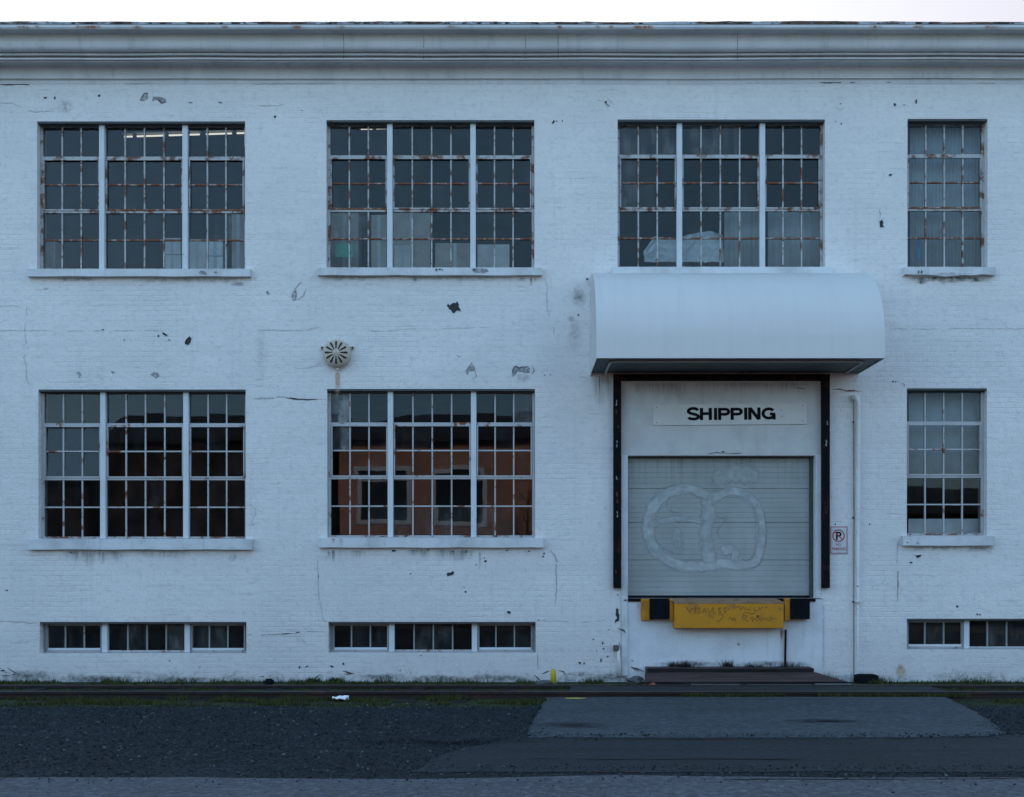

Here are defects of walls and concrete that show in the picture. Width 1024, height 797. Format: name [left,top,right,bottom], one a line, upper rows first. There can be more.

spalling [447,301,462,314]
crack [254,394,317,402]